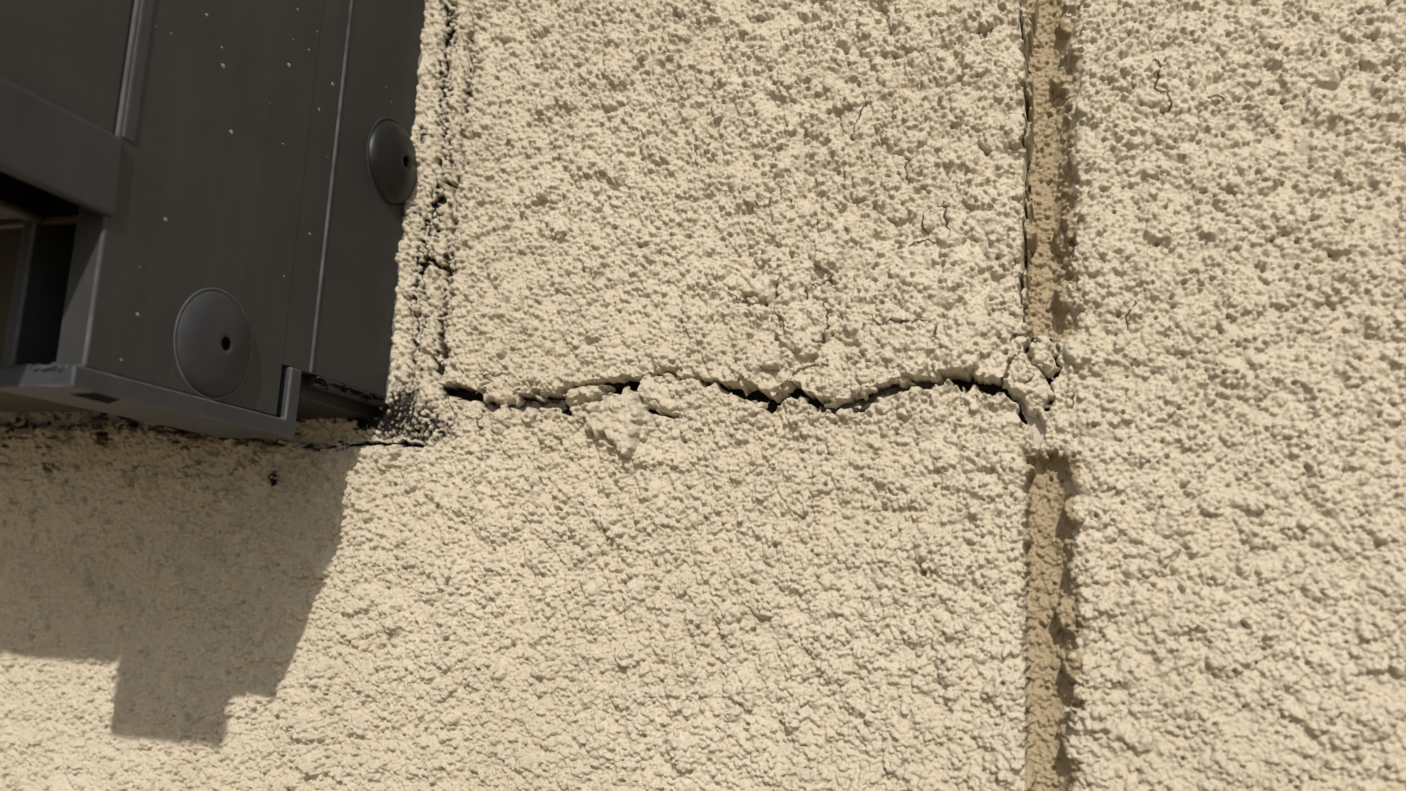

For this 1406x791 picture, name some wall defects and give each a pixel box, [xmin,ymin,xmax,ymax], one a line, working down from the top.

crack [444,26,474,99]
crack [850,97,867,141]
damp [0,0,459,486]
crack [422,134,458,296]
crack [904,159,951,246]
crack [412,276,1075,436]